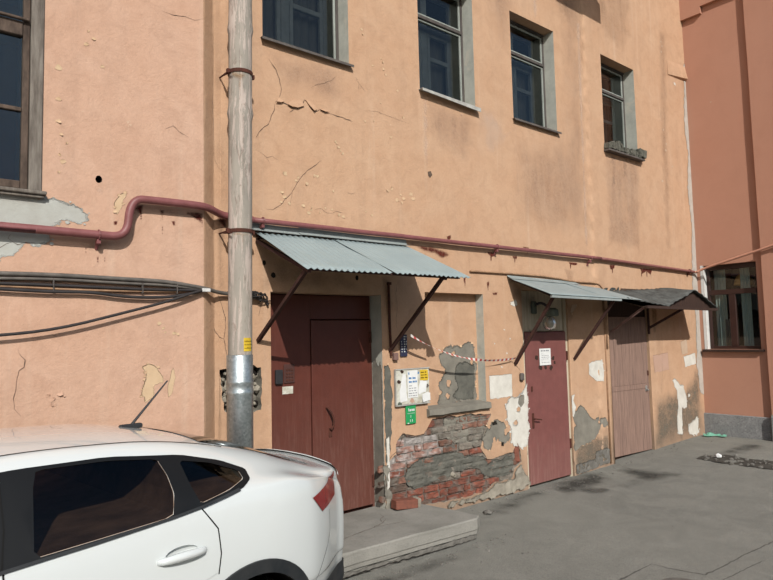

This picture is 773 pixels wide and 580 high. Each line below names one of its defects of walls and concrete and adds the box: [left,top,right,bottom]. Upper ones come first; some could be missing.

crack [256,61,351,157]
peeling [0,194,90,261]
peeling [140,363,175,402]
flaking render [372,360,531,509]
peeling [438,342,477,404]
peeling [572,394,608,451]
damp [658,383,698,440]
peeling [673,378,700,436]